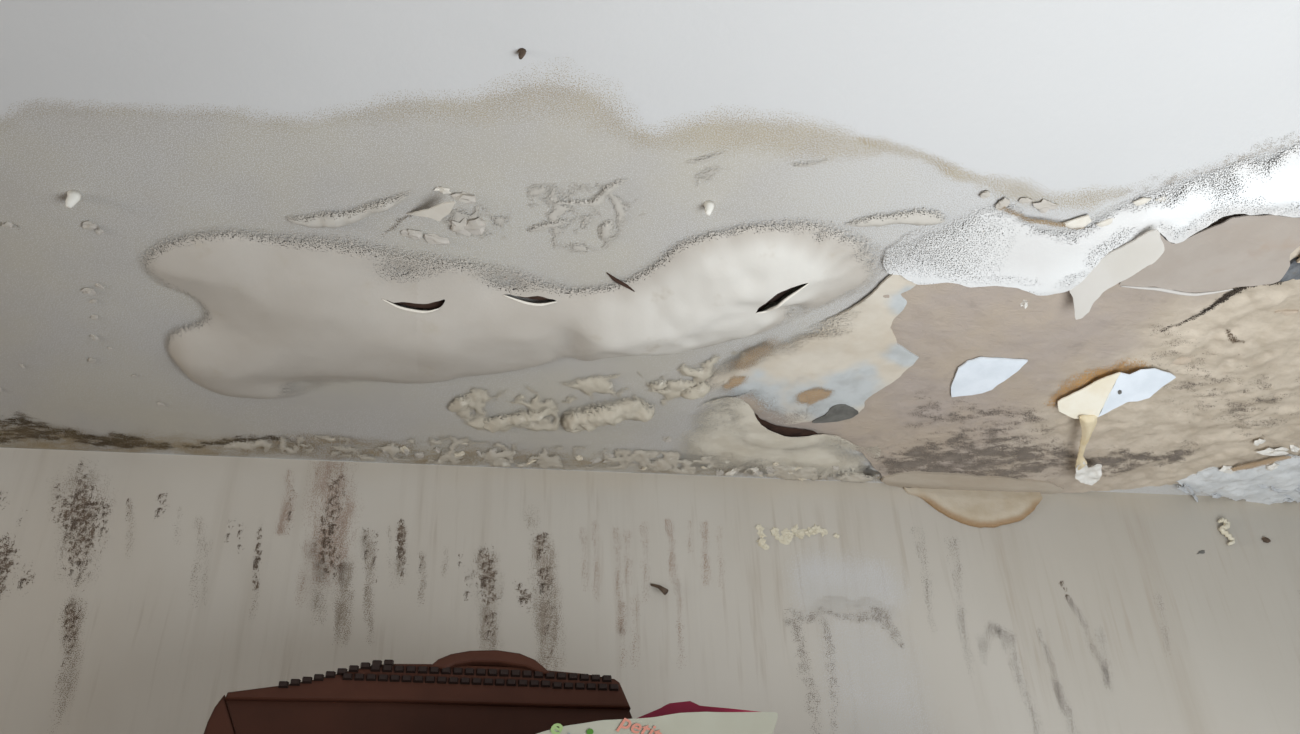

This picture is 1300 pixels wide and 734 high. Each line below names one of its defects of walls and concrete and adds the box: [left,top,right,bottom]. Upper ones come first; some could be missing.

leakage [506,294,556,303]
flaking render [221,141,1300,528]
leakage [1279,257,1300,282]
leakage [1143,325,1300,441]
leakage [785,391,1198,483]
leakage [0,510,34,600]
leakage [46,459,116,733]
leakage [249,527,262,619]
leakage [359,529,379,646]
leakage [387,519,428,604]
leakage [440,509,567,670]